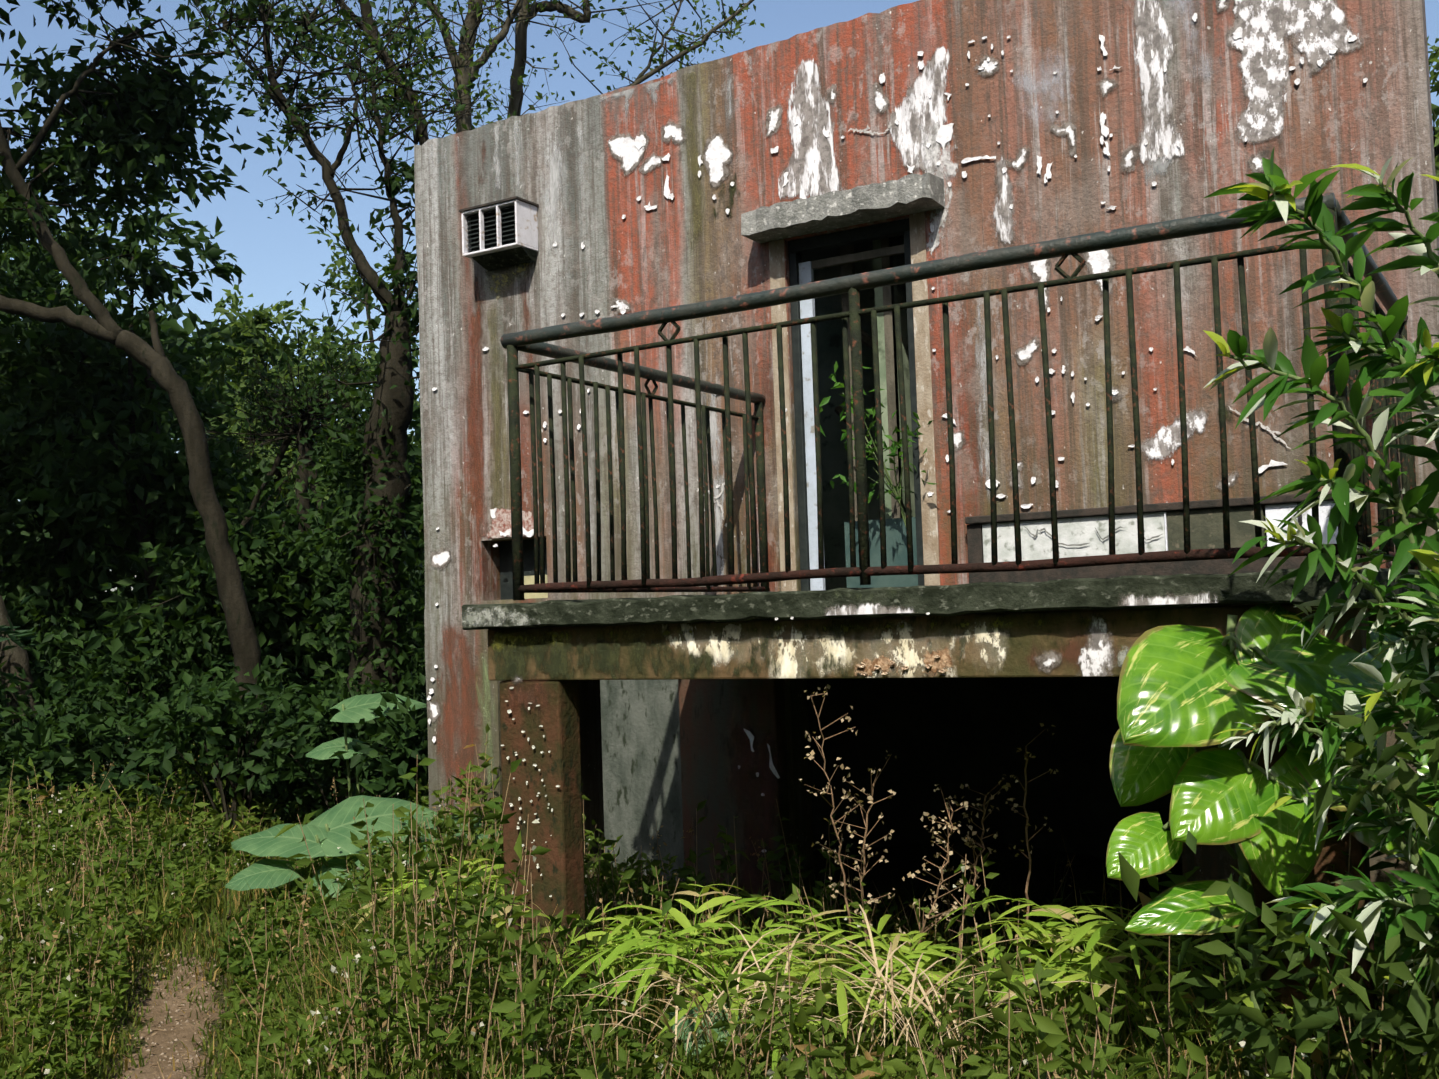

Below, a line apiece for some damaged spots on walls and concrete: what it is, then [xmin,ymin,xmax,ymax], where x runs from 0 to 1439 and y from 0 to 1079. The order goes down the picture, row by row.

peeling [826,83,837,103]
peeling [873,73,889,114]
peeling [608,121,685,211]
peeling [698,132,734,214]
rust [467,277,485,591]
peeling [1128,409,1208,465]
spalling [854,647,953,676]
rust [437,628,479,811]